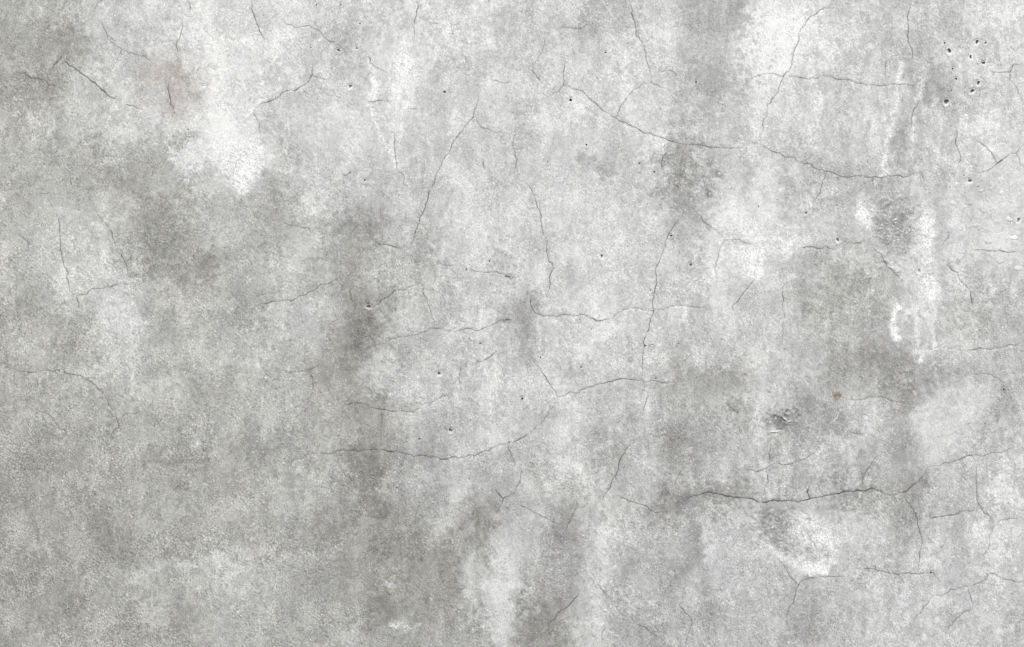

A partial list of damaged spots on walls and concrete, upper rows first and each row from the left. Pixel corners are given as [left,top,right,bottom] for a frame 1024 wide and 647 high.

damp [853,193,876,237]
damp [889,197,943,364]